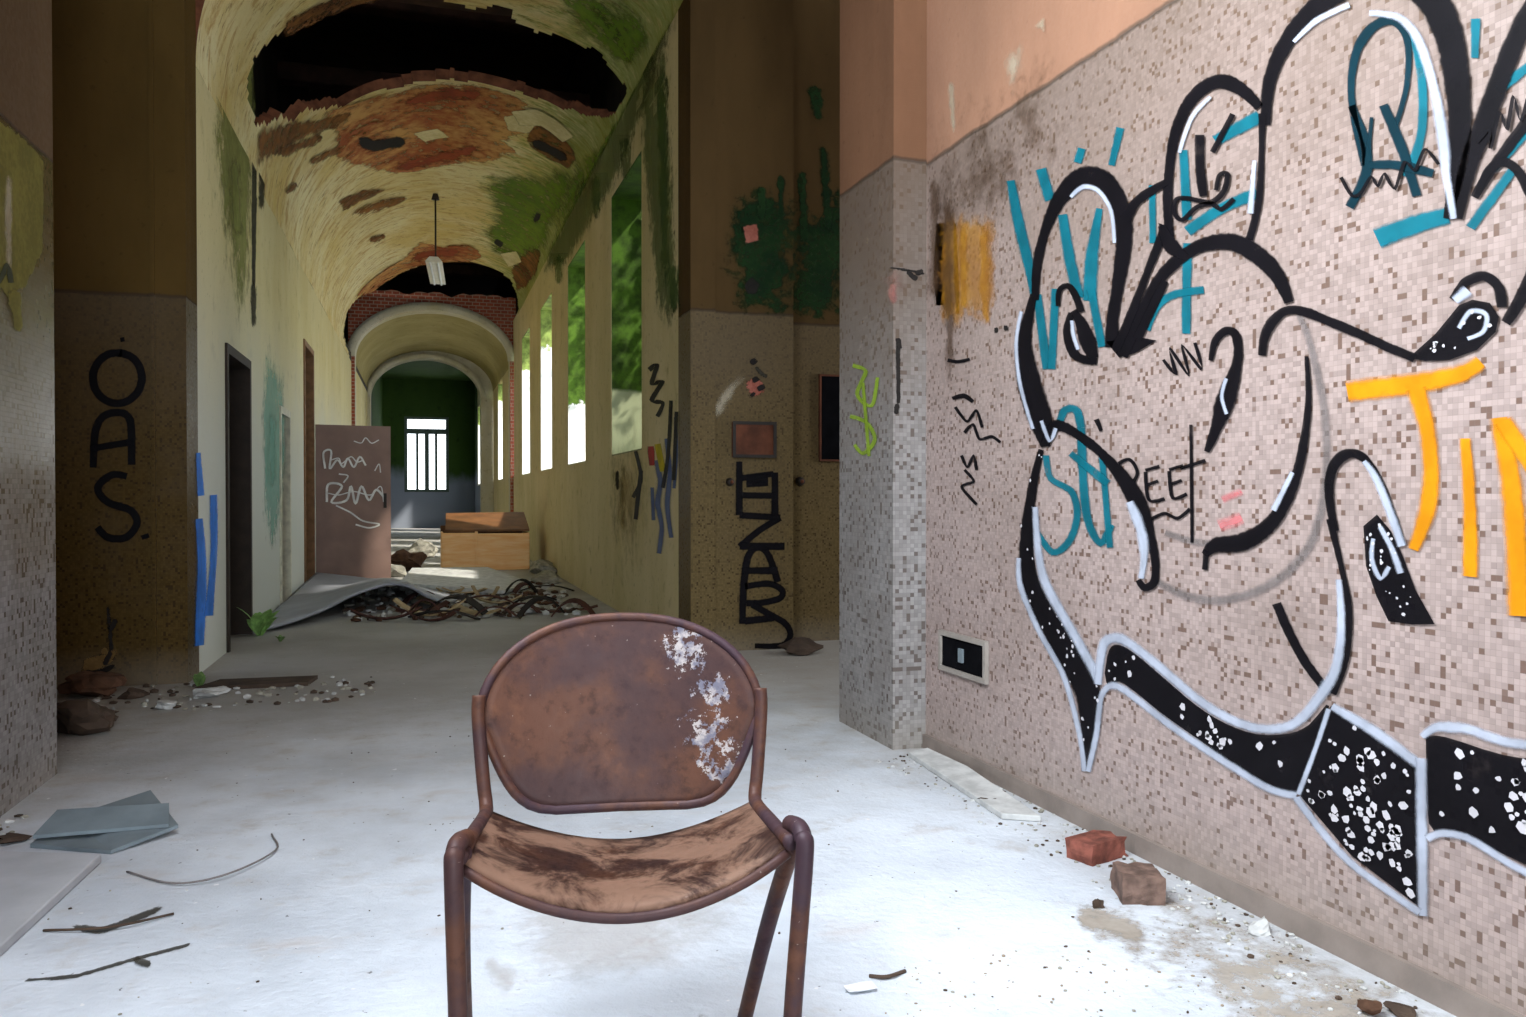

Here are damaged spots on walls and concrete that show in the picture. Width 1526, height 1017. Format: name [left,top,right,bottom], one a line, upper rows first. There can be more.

flaking render [284,0,376,36]
flaking render [258,84,576,173]
flaking render [340,189,407,216]
leakage [657,74,679,312]
leakage [756,147,833,243]
flaking render [358,239,540,296]